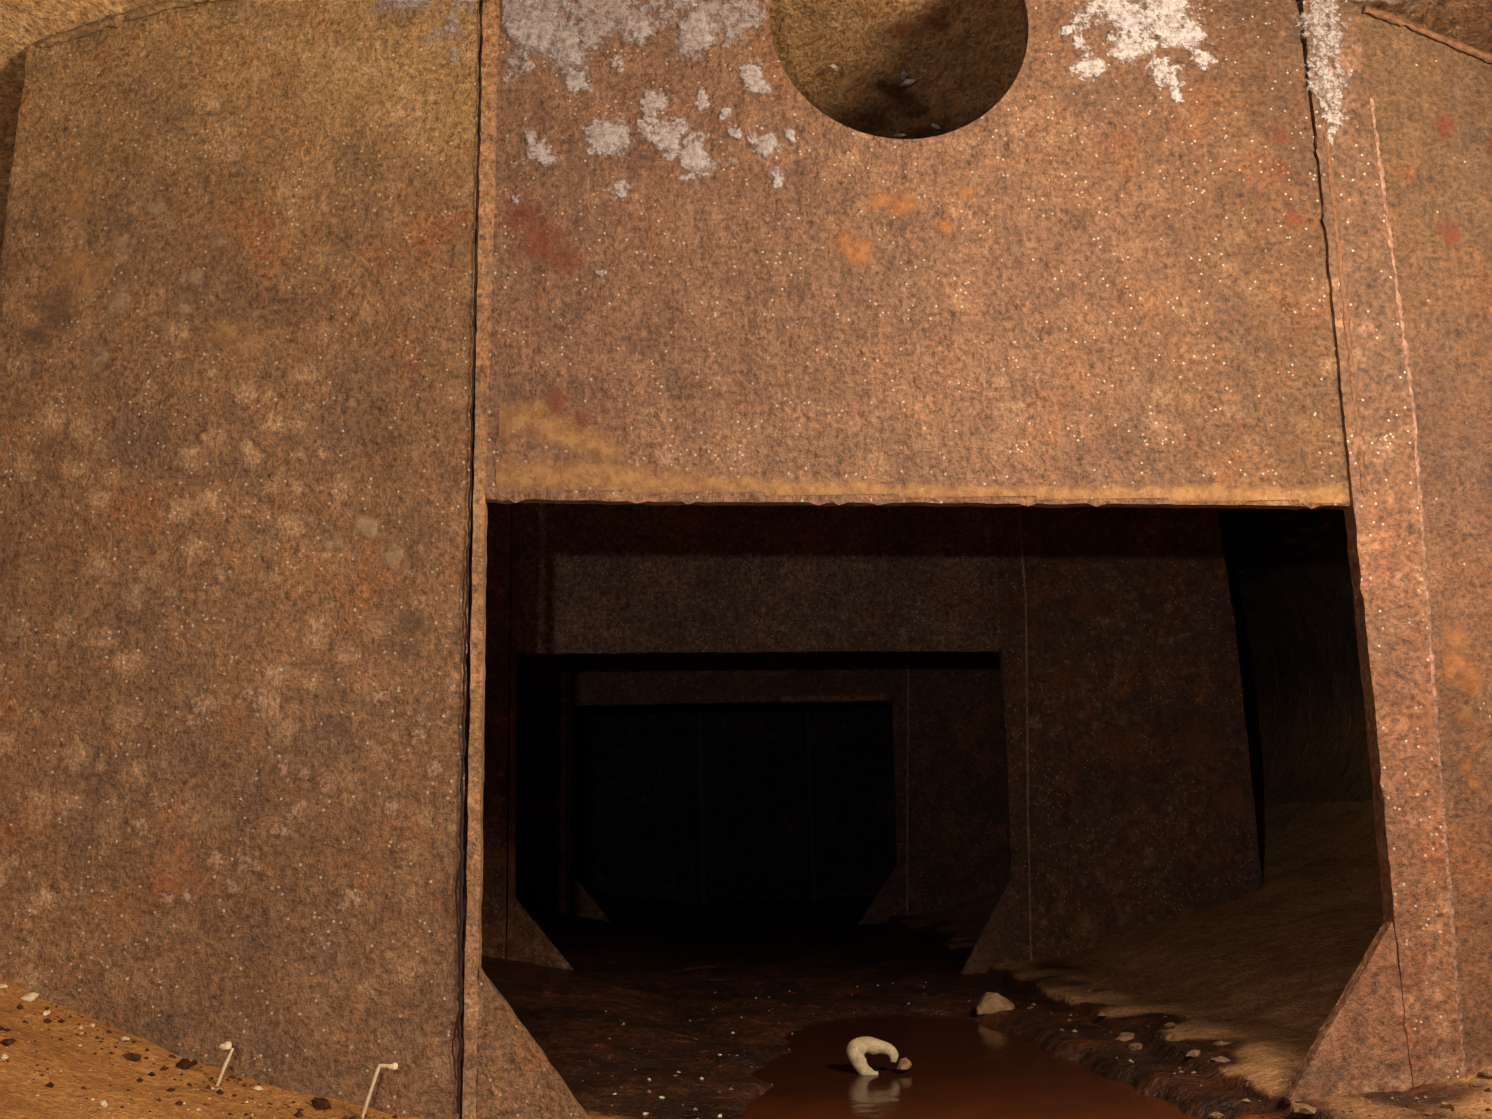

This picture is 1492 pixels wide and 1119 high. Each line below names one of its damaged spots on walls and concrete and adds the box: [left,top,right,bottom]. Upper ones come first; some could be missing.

damp [375,0,473,62]
damp [502,0,765,93]
damp [739,61,771,93]
damp [1062,0,1216,102]
damp [1298,0,1415,144]
damp [523,130,557,166]
damp [603,180,630,199]
damp [582,89,795,188]